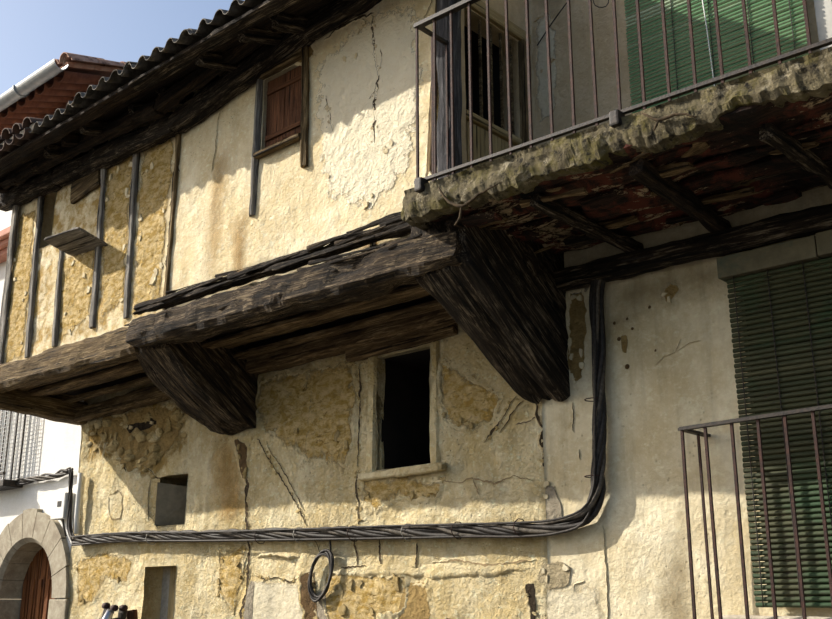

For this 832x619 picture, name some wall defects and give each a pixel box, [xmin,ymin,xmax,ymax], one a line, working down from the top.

crack [324,12,383,143]
peeling [295,6,439,210]
spalling [6,211,35,363]
spalling [60,139,173,336]
peeling [565,286,591,390]
crack [257,363,383,569]
crack [438,396,544,495]
crack [572,402,581,460]
crack [233,448,299,619]
spalling [296,568,436,619]
crack [403,542,420,568]
spalling [521,568,548,619]